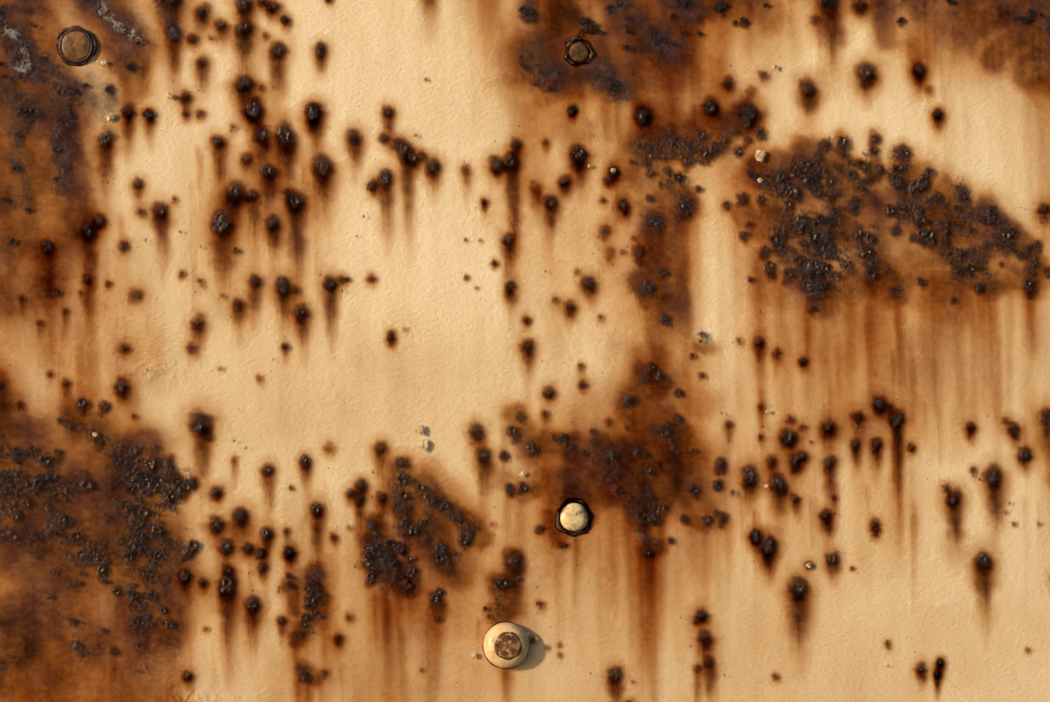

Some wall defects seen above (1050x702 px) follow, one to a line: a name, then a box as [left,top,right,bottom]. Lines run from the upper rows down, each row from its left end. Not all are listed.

rust [0,0,154,321]
rust [132,177,177,251]
rust [305,101,322,140]
rust [310,153,332,204]
rust [345,128,360,163]
rust [366,105,440,215]
rust [274,275,309,355]
rust [320,274,350,326]
rust [468,0,1050,626]
rust [0,365,328,702]
rust [309,440,494,624]
rust [786,561,812,644]